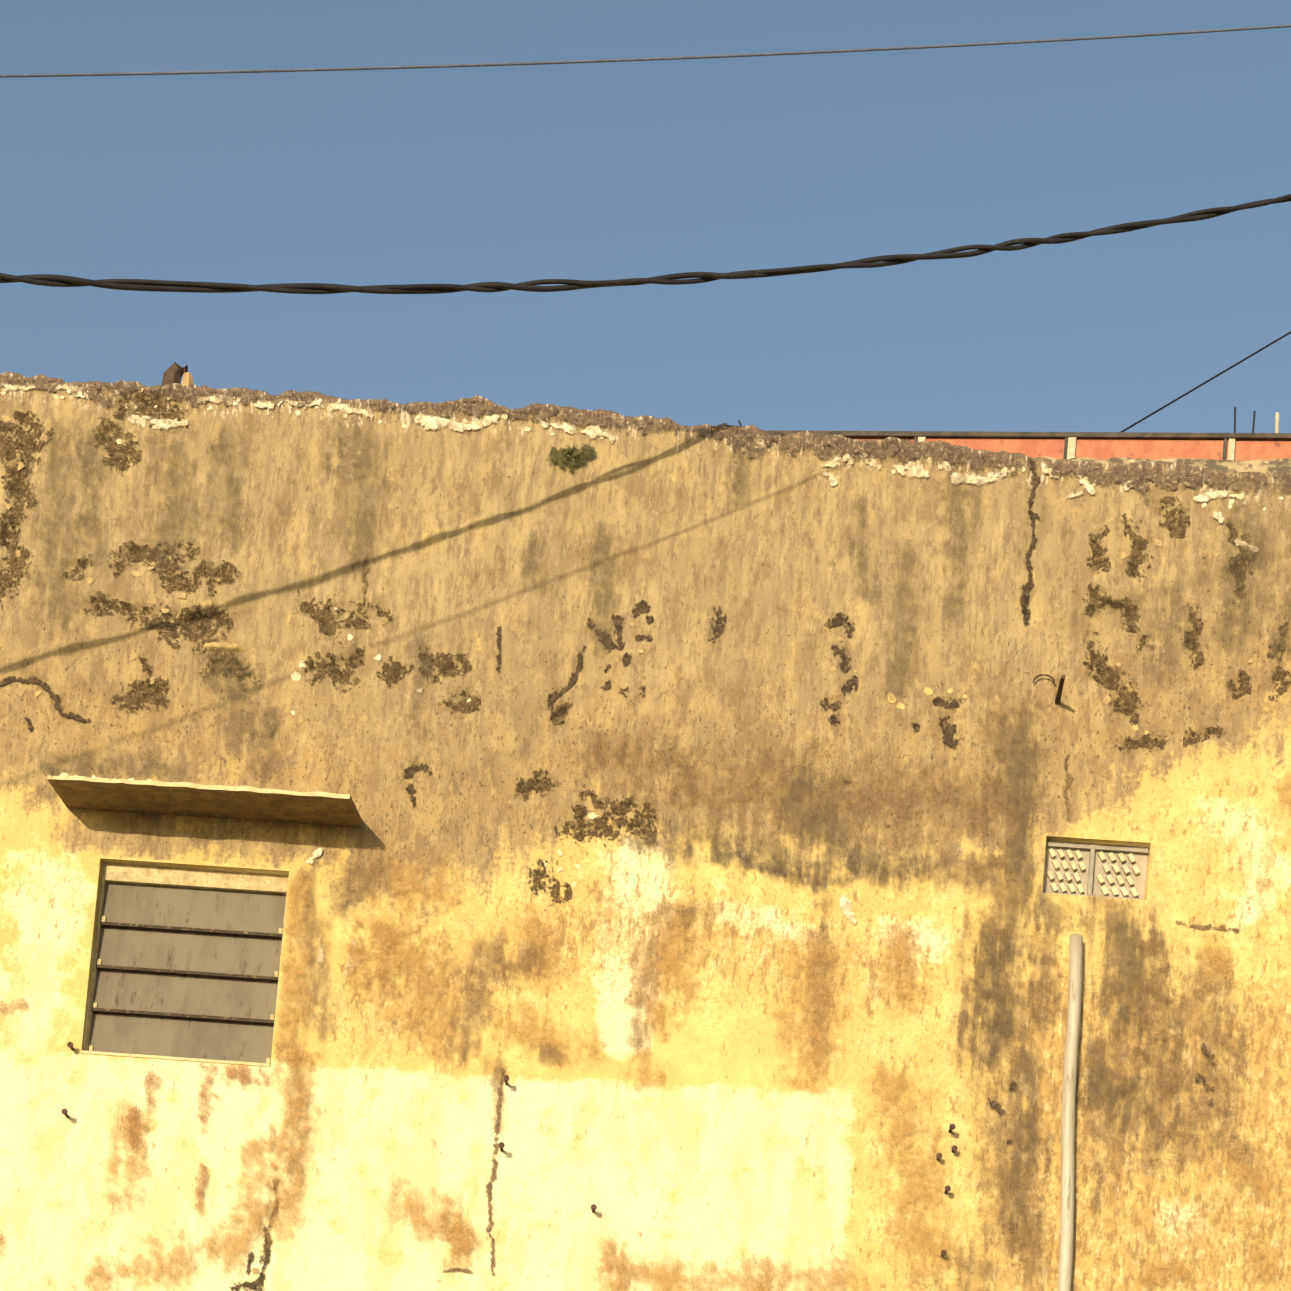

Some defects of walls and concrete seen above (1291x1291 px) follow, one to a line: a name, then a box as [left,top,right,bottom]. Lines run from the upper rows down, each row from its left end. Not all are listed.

spalling [63,540,240,655]
spalling [0,382,382,608]
spalling [291,590,481,714]
spalling [587,600,654,697]
spalling [820,612,858,726]
peeling [822,453,1015,486]
crack [1018,459,1044,627]
spalling [1083,632,1225,756]
spalling [1081,490,1259,652]
spalling [528,784,659,911]
damp [667,700,1061,1280]
damp [1084,895,1254,1167]